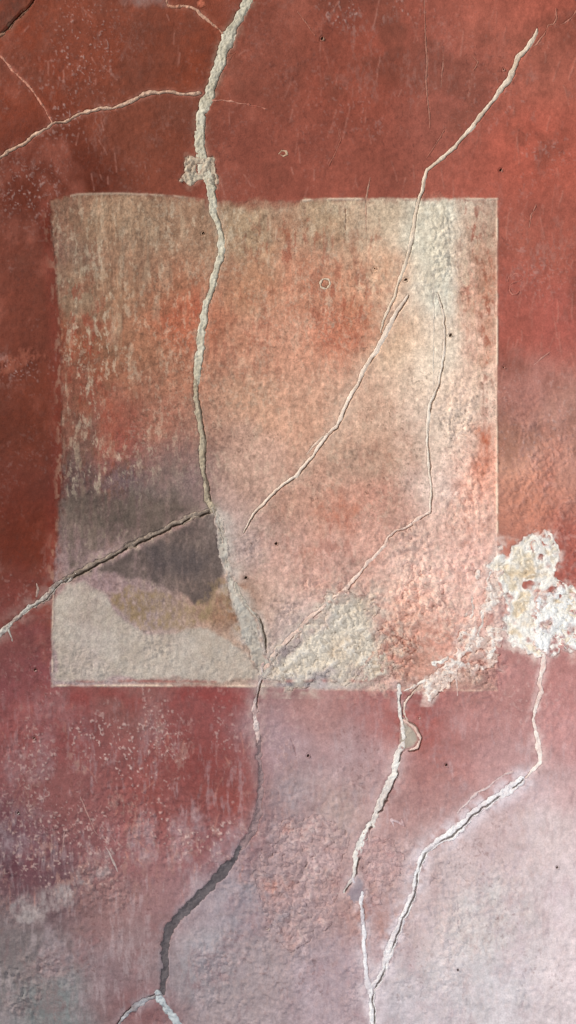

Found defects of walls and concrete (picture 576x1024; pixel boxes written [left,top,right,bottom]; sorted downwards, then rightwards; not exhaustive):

crack [0,0,446,1024]
crack [243,8,576,534]
crack [343,654,547,1024]
spalling [404,529,576,702]